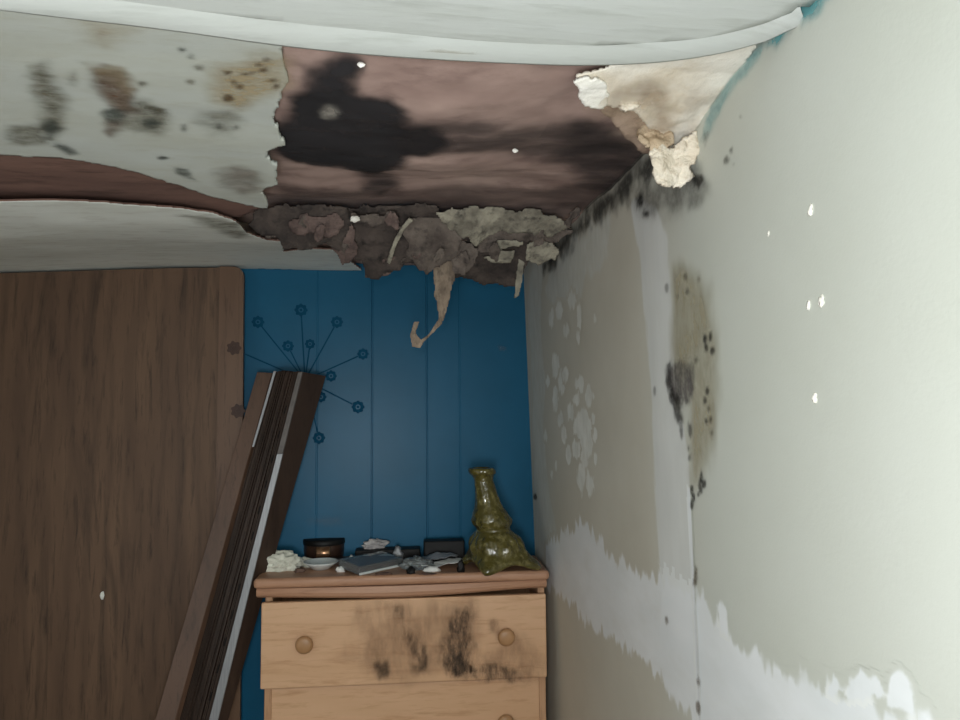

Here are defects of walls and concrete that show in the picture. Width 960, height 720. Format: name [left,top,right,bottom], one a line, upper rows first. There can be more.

leakage [13,70,62,144]
leakage [223,63,277,106]
leakage [276,56,653,271]
spalling [232,44,757,348]
leakage [667,273,714,457]